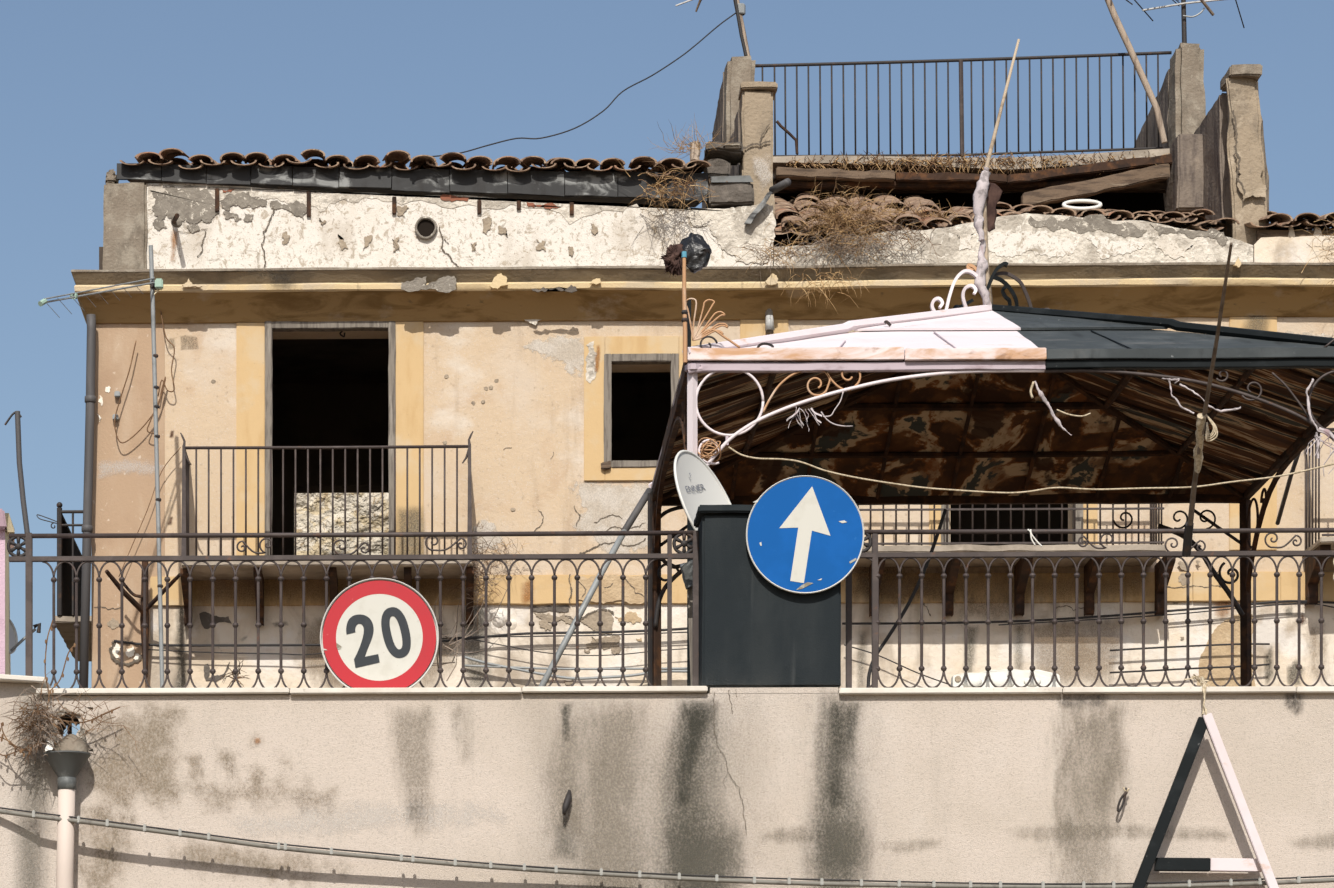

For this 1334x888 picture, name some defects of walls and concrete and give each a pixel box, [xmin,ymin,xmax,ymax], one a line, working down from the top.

peeling [150,185,327,233]
flaking render [440,194,469,202]
peeling [338,234,373,250]
peeling [471,217,508,251]
flaking render [687,204,778,286]
peeling [988,214,1228,259]
spalling [401,276,457,293]
peeling [533,574,648,654]
leakage [669,704,725,888]
leakage [816,713,856,888]